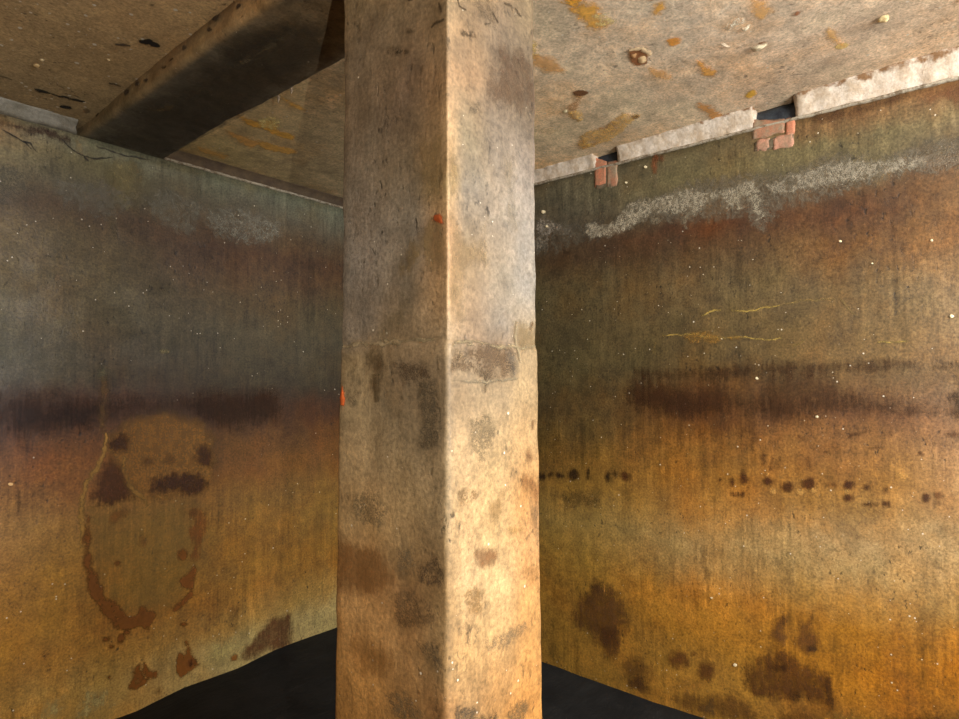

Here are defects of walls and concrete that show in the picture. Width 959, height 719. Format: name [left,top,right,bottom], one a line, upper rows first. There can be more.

spalling [563,90,588,122]
crack [62,139,149,161]
flaking render [578,113,640,189]
flaking render [752,118,795,152]
leakage [586,139,959,238]
leakage [539,469,590,480]
leakage [455,706,496,719]